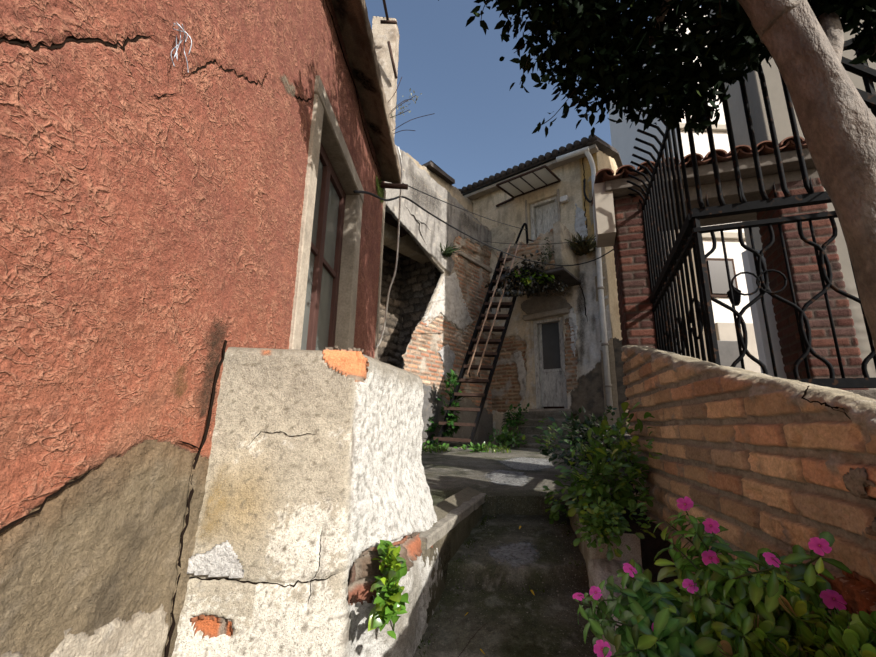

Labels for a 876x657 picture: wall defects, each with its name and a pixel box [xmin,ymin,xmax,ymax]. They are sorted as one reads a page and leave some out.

crack [0,15,167,50]
crack [153,59,325,104]
spalling [402,236,527,414]
spalling [322,345,369,383]
crack [801,386,850,419]
crack [165,339,345,657]
flaking render [0,440,244,657]
spalling [392,532,433,572]
spalling [347,547,388,606]